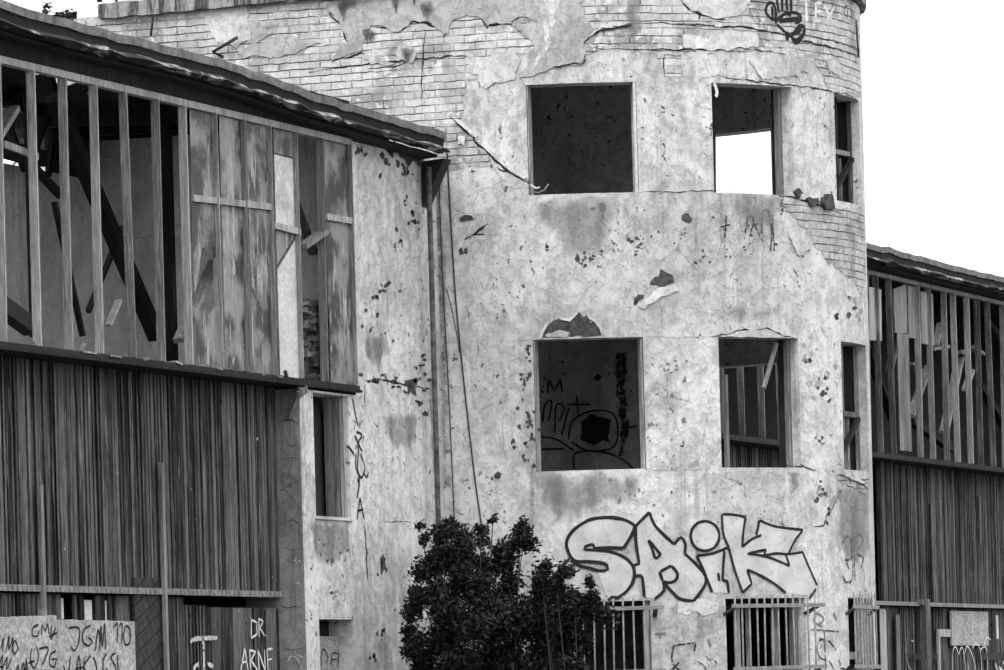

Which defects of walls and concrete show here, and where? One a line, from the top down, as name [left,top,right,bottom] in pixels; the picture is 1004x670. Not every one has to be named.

crack [309,12,467,119]
peeling [91,0,861,170]
crack [553,3,857,98]
spalling [355,141,424,179]
crack [448,116,529,183]
spalling [634,269,679,309]
peeling [772,188,866,321]
spalling [511,311,602,468]
peeling [799,364,837,406]